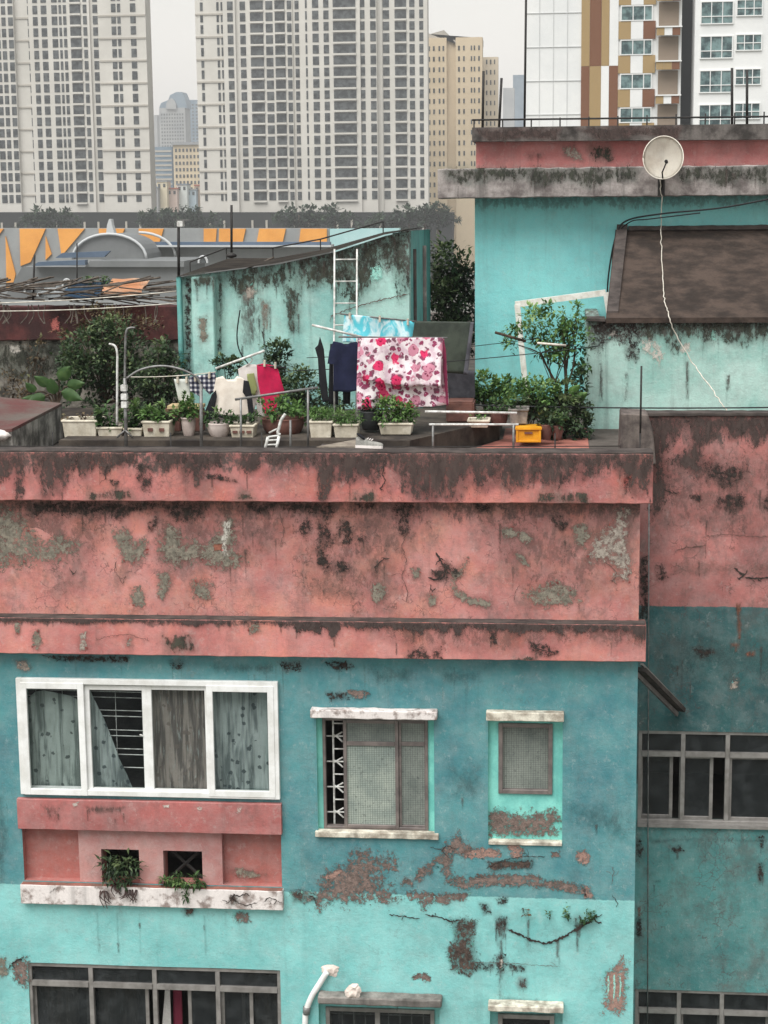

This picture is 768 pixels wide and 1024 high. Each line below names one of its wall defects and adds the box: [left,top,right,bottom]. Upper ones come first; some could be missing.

water stain [443,126,679,188]
water stain [678,165,768,187]
water stain [184,230,411,372]
water stain [0,416,768,573]
peeling [111,510,249,608]
peeling [521,579,582,610]
peeling [572,506,636,583]
crack [734,568,768,582]
peeling [289,805,595,913]
water stain [445,896,526,988]
crack [470,867,618,967]
peeling [600,954,631,1018]